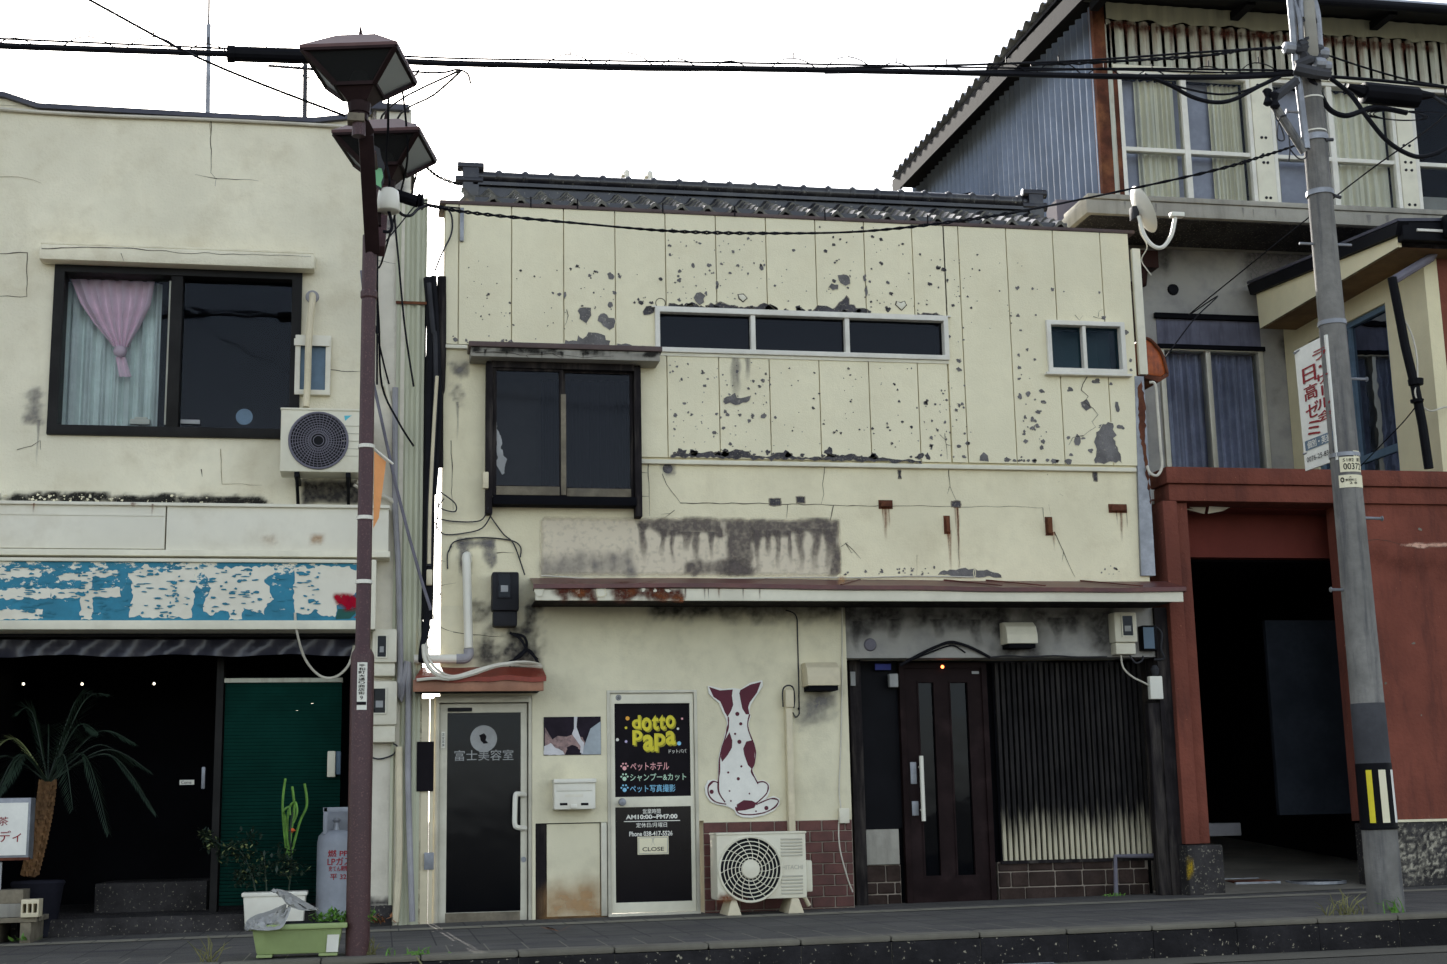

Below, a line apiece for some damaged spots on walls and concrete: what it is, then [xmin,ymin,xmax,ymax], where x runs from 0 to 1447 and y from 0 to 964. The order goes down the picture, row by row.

peeling [452,265,660,357]
peeling [633,226,980,342]
peeling [663,348,1125,482]
water stain [0,492,267,504]
water stain [639,518,840,576]
corrosion [555,582,686,602]
water stain [652,607,1036,655]
water stain [1038,608,1112,646]